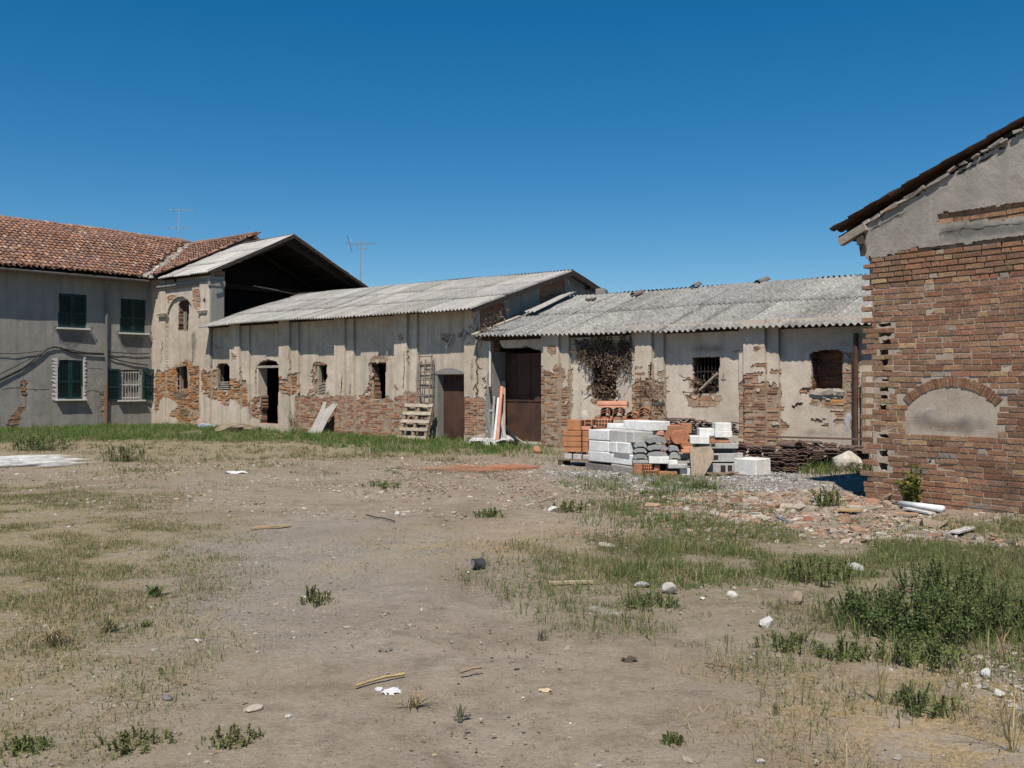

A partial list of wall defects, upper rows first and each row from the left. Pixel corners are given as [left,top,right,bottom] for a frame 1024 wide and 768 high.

flaking render [5,380,29,428]
flaking render [154,359,261,424]
flaking render [279,355,430,438]
flaking render [541,345,573,448]
flaking render [630,363,723,421]
flaking render [737,346,862,450]